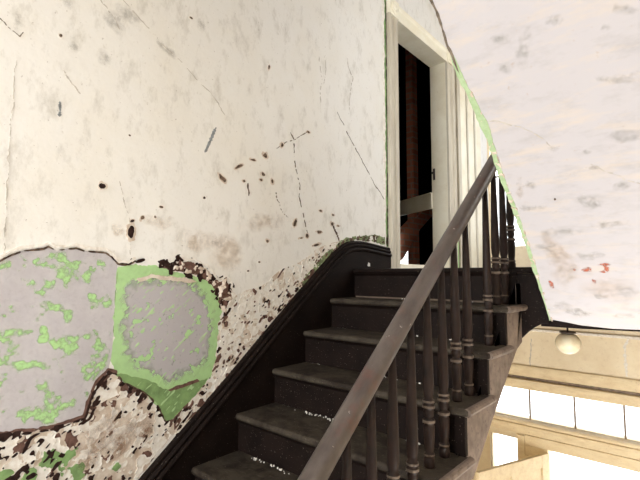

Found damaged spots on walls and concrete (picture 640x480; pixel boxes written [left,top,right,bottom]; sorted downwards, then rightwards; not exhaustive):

peeling [0,0,388,480]
crack [276,132,308,233]
crack [337,58,384,199]